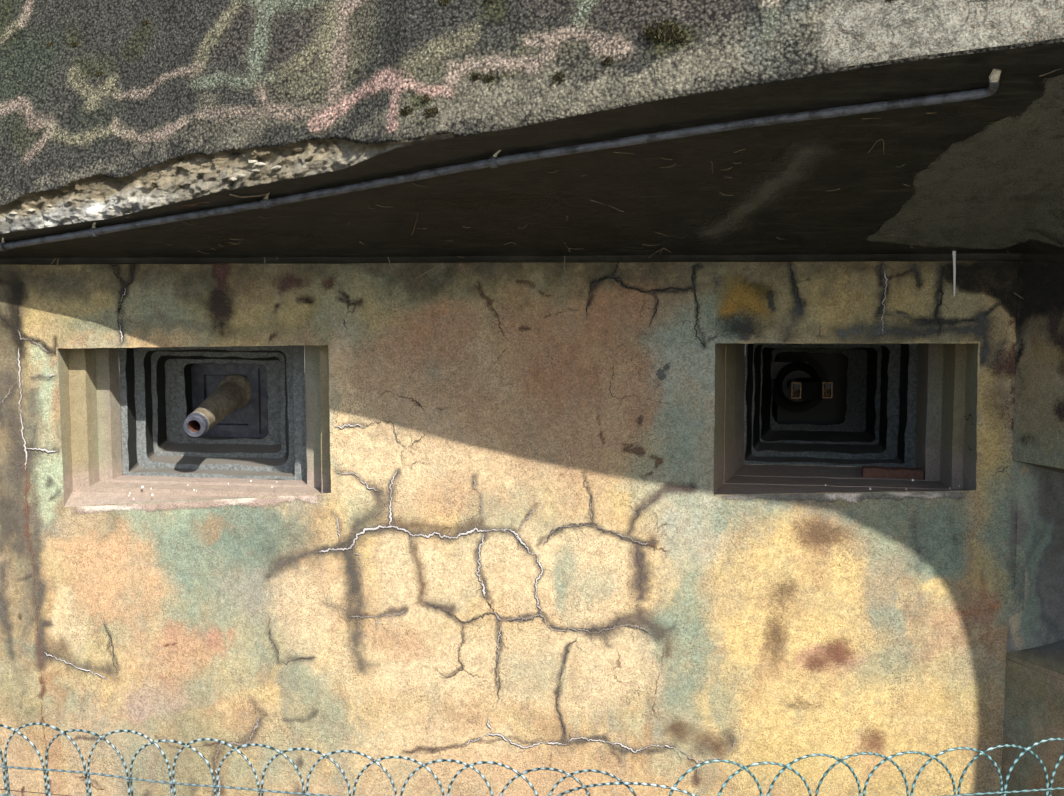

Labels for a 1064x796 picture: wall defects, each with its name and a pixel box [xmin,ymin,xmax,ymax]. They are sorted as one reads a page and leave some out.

spalling [0,0,634,234]
peeling [867,75,1064,249]
crack [111,264,137,343]
crack [583,263,708,403]
leakage [836,311,1006,366]
leakage [945,261,1064,374]
leakage [0,497,21,655]
crack [0,281,117,783]
crack [269,617,315,665]
crack [314,390,698,775]